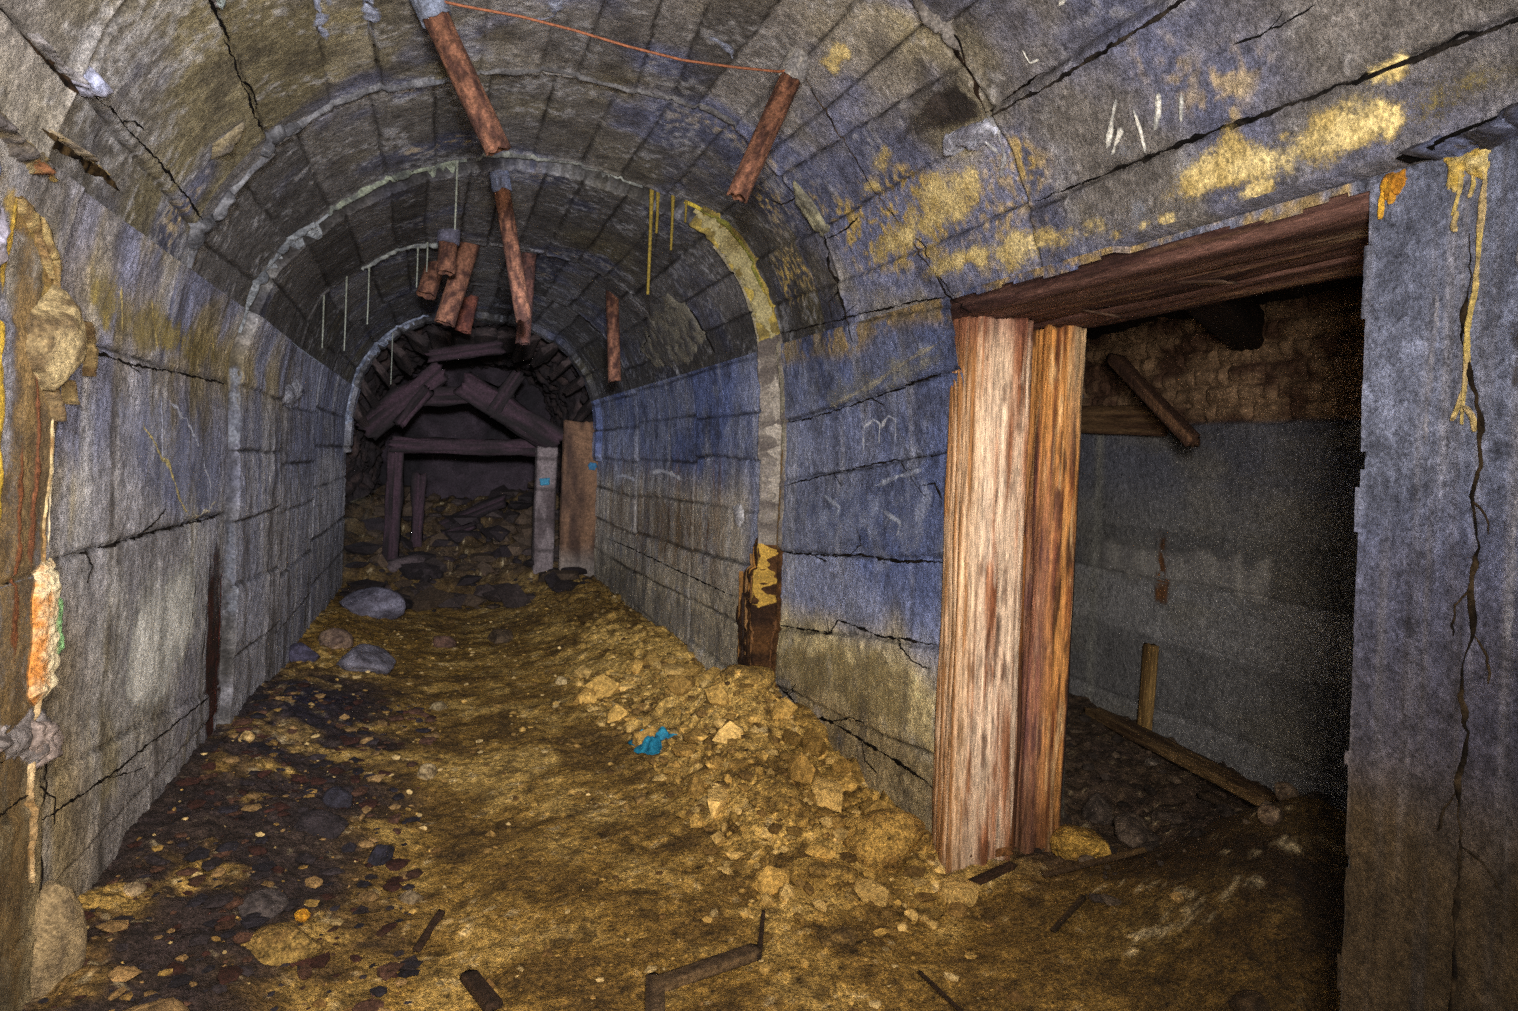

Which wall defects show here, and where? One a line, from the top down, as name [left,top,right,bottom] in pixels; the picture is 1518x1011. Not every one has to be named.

peeling [27,33,114,98]
crack [1233,4,1315,45]
water stain [1371,55,1408,81]
flaking render [0,204,11,266]
spalling [0,111,111,183]
water stain [874,168,980,262]
water stain [1180,100,1406,197]
water stain [1377,168,1407,219]
water stain [1444,148,1491,432]
water stain [684,201,789,550]
water stain [0,191,65,733]
crack [1437,233,1500,1011]